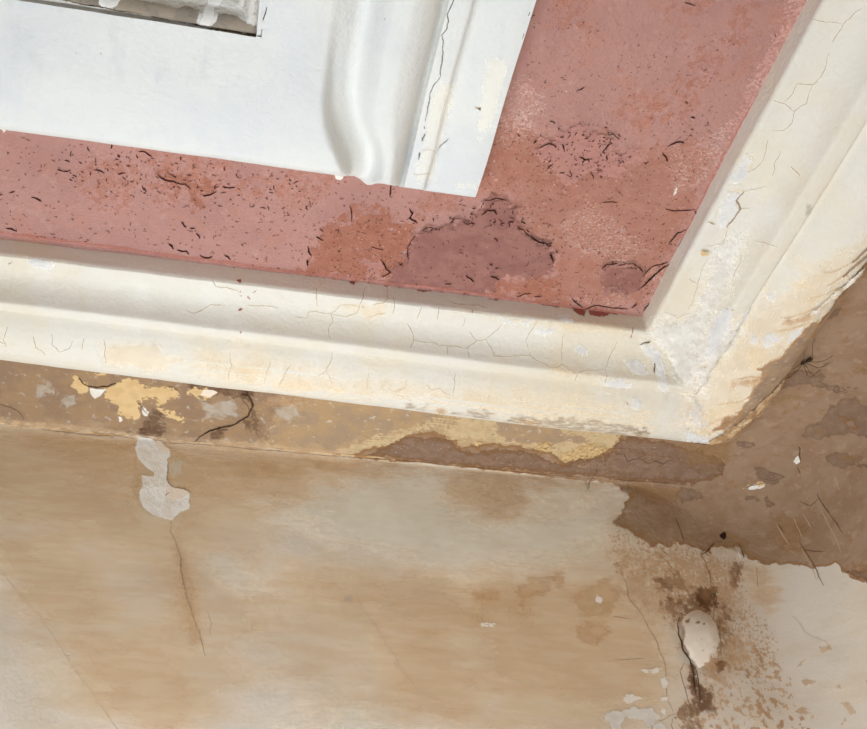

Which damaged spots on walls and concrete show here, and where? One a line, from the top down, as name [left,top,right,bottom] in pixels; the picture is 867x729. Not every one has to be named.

crack [418,0,454,160]
crack [169,222,231,260]
crack [572,209,696,311]
peeling [71,373,217,423]
flaking render [135,436,190,520]
damp [0,262,867,587]
peeling [343,415,621,463]
crack [170,521,205,654]
damp [653,570,734,634]
crack [618,568,701,729]
damp [675,664,716,729]